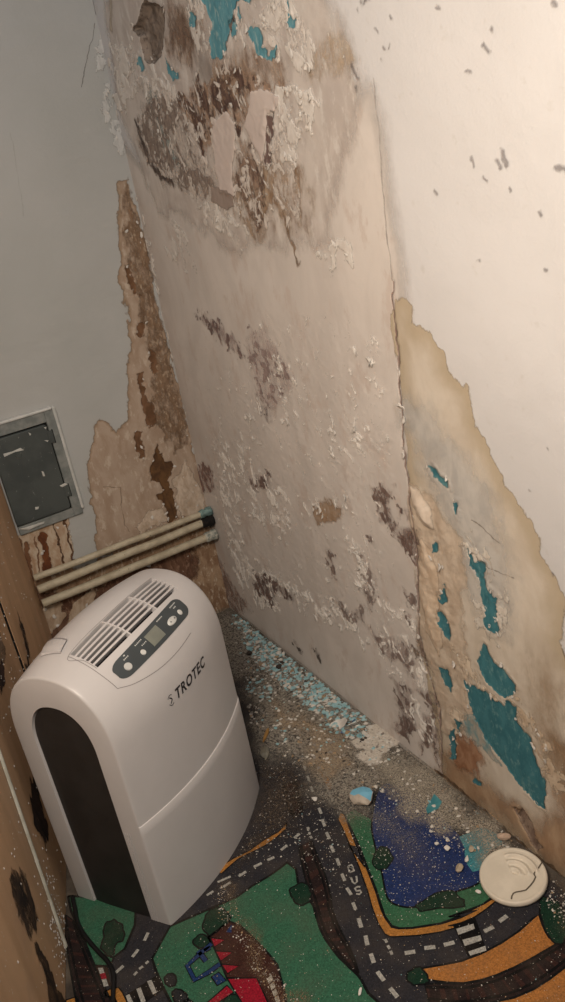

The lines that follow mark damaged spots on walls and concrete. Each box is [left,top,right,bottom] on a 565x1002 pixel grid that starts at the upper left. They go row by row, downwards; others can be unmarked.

spalling [94,0,320,251]
spalling [134,349,205,534]
water stain [87,0,565,877]
water stain [17,612,30,670]
peeling [43,588,97,634]
water stain [51,589,91,638]
water stain [33,526,211,609]
peeling [437,584,451,642]
peeling [467,548,499,637]
peeling [439,643,546,809]
water stain [30,777,49,847]
water stain [10,868,65,1002]